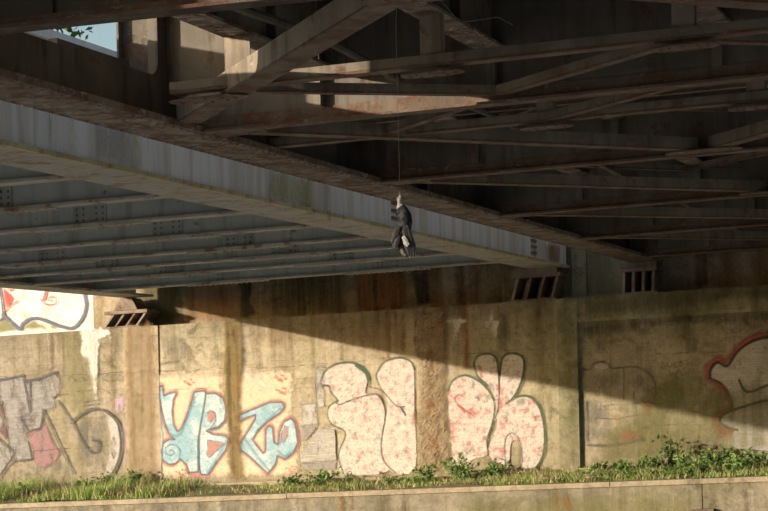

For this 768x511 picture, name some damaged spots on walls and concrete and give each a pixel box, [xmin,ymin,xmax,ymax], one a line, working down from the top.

rust [356,271,405,311]
damp [81,329,110,390]
damp [222,282,254,479]